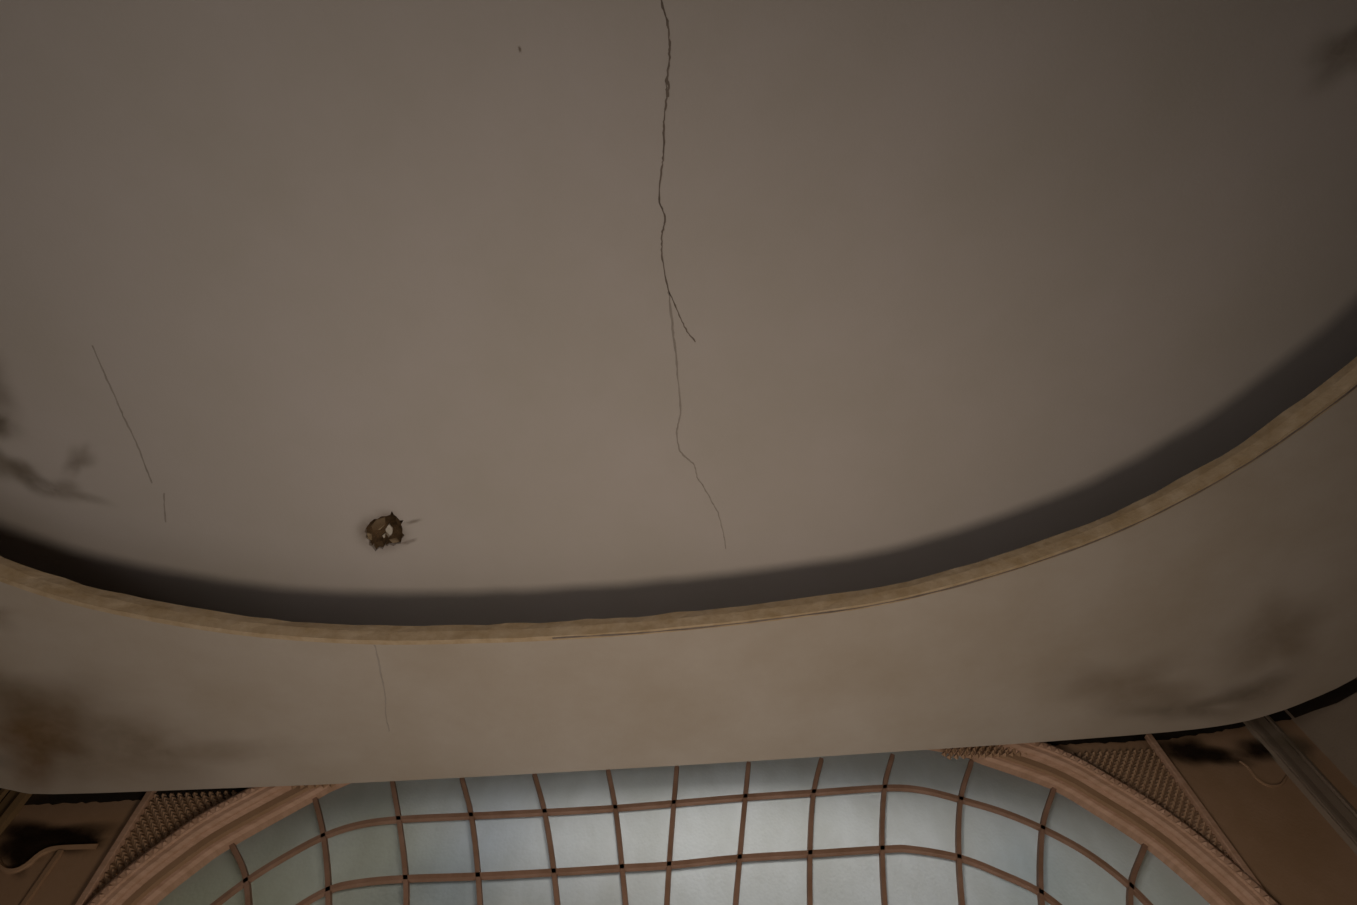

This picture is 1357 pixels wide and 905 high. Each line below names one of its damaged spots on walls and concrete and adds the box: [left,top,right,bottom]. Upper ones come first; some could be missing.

spalling [366,512,404,549]
crack [658,0,726,549]